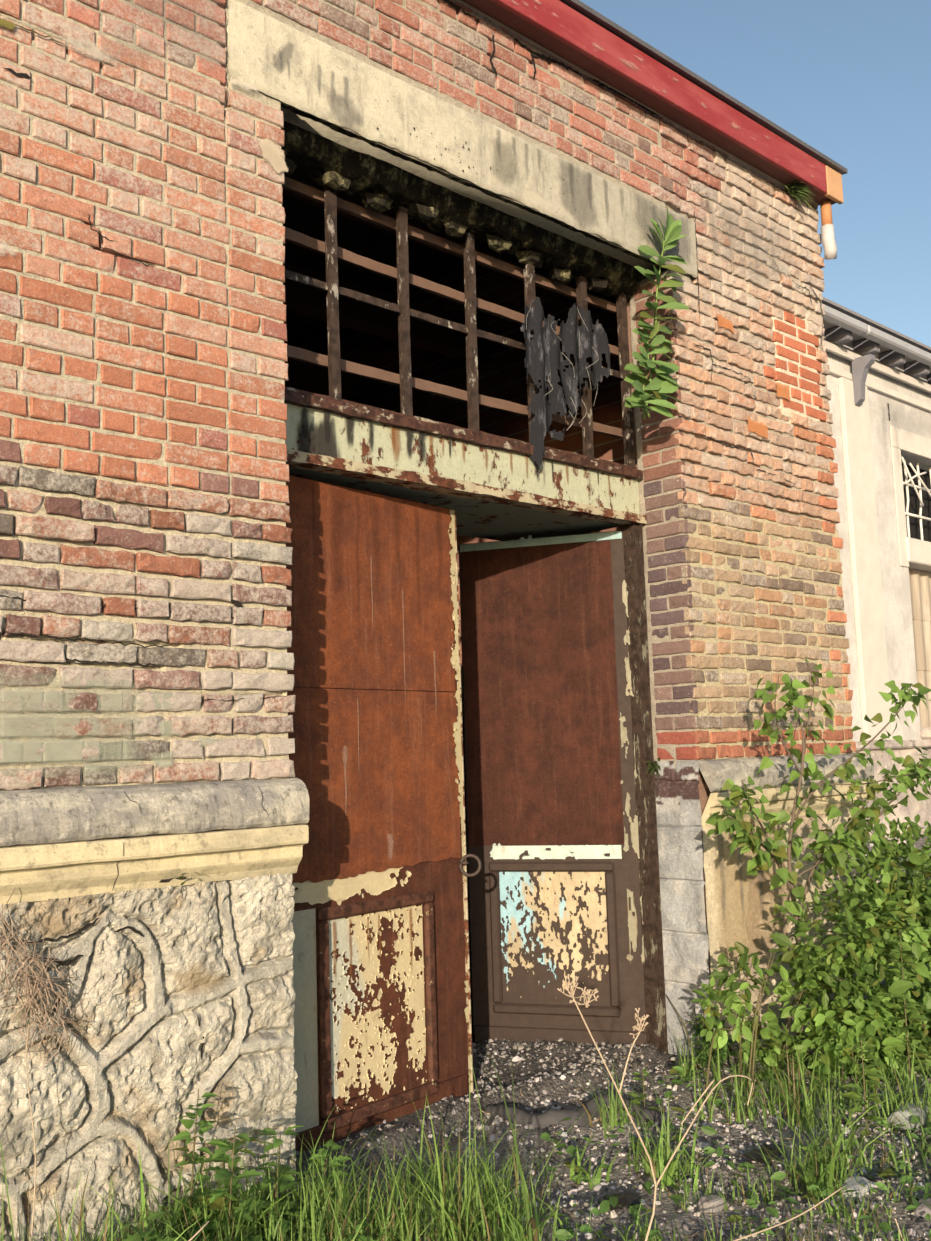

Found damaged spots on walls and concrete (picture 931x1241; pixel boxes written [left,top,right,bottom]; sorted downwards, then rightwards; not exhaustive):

crack [444,0,660,118]
crack [88,215,153,266]
crack [0,630,180,666]
peeling [448,510,626,883]
peeling [622,580,634,696]
peeling [490,712,640,1005]
crack [13,918,144,966]
corrosion [333,920,352,972]
peeling [292,867,427,1133]
peeling [626,889,645,963]